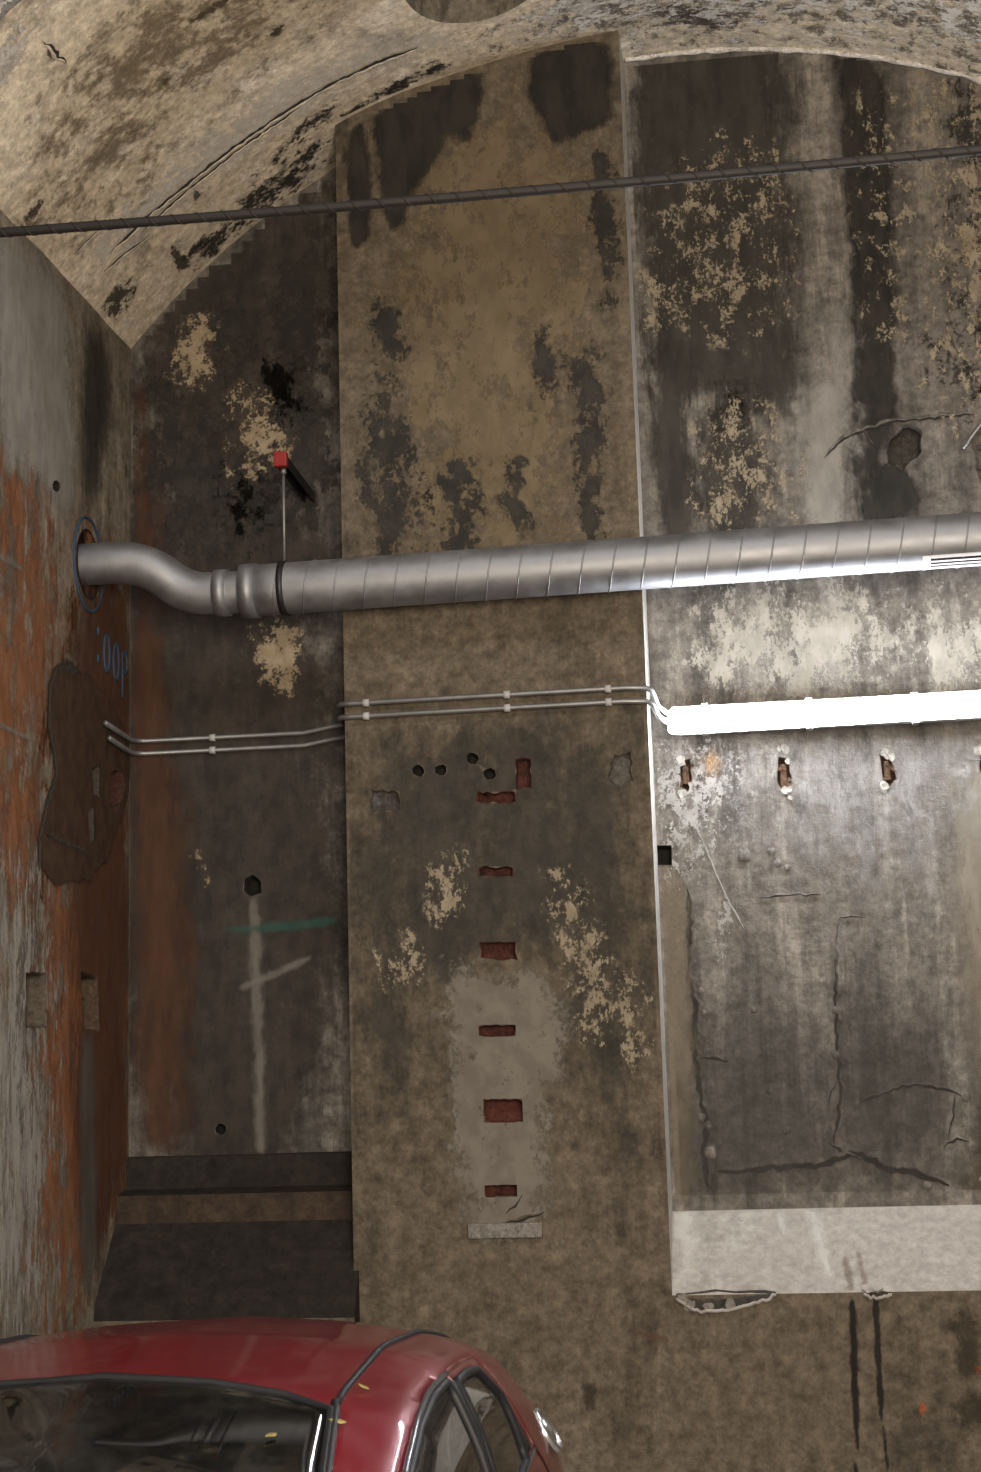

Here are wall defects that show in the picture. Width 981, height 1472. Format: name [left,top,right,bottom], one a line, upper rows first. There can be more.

crack [43,41,67,64]
crack [75,47,419,273]
leakage [96,26,482,263]
leakage [529,42,614,142]
peeling [470,0,981,483]
leakage [587,53,919,534]
peeling [682,388,812,530]
rust [0,439,197,1335]
peeling [423,844,470,928]
crack [684,889,970,1192]
spalling [675,1289,776,1314]
leakage [849,1299,889,1472]